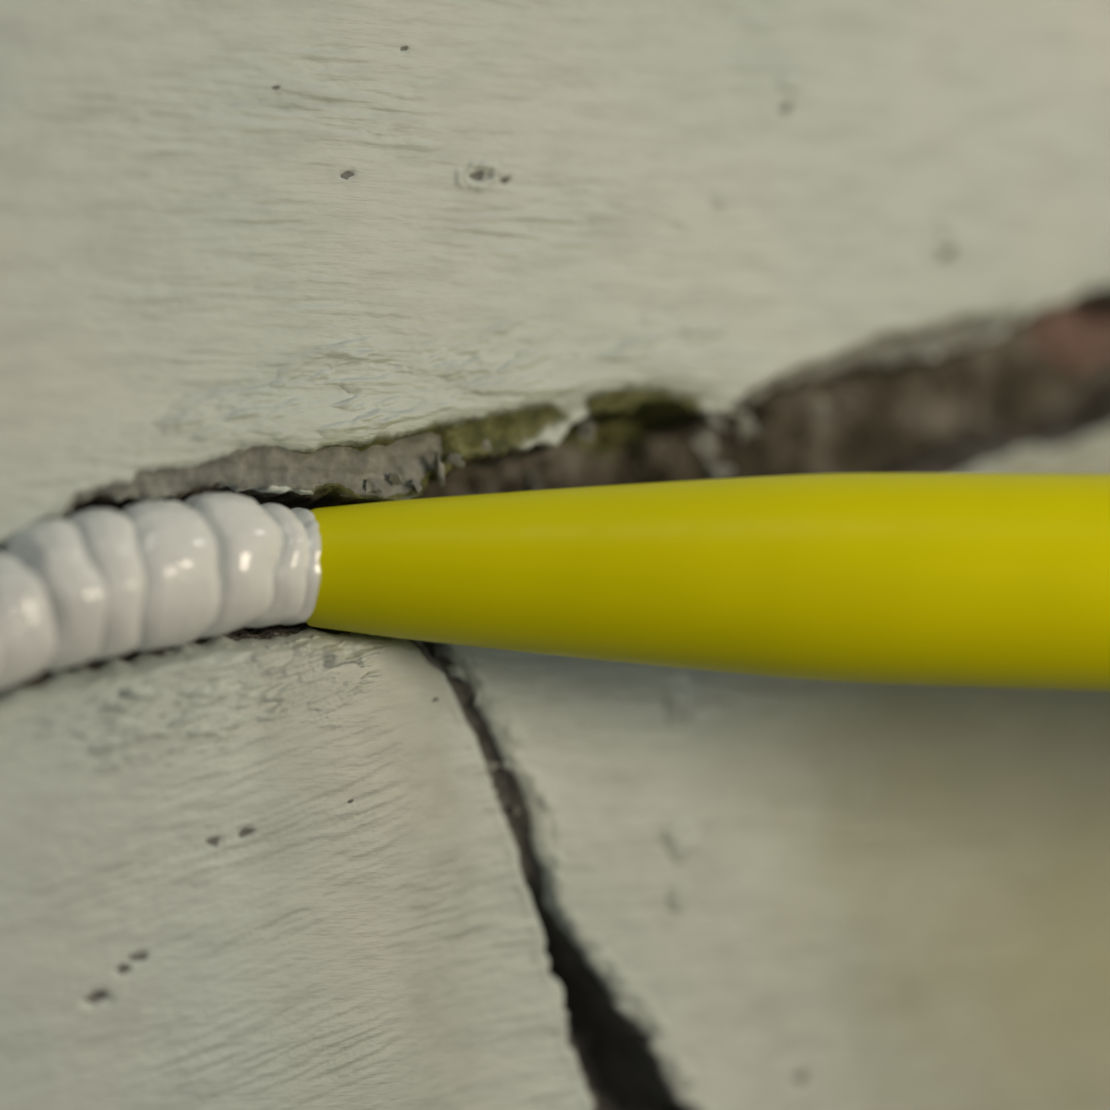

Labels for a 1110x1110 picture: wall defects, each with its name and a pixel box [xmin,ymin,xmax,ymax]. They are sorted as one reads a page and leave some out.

spalling [35,432,442,522]
crack [64,286,1110,519]
crack [0,623,369,694]
crack [407,639,689,1110]